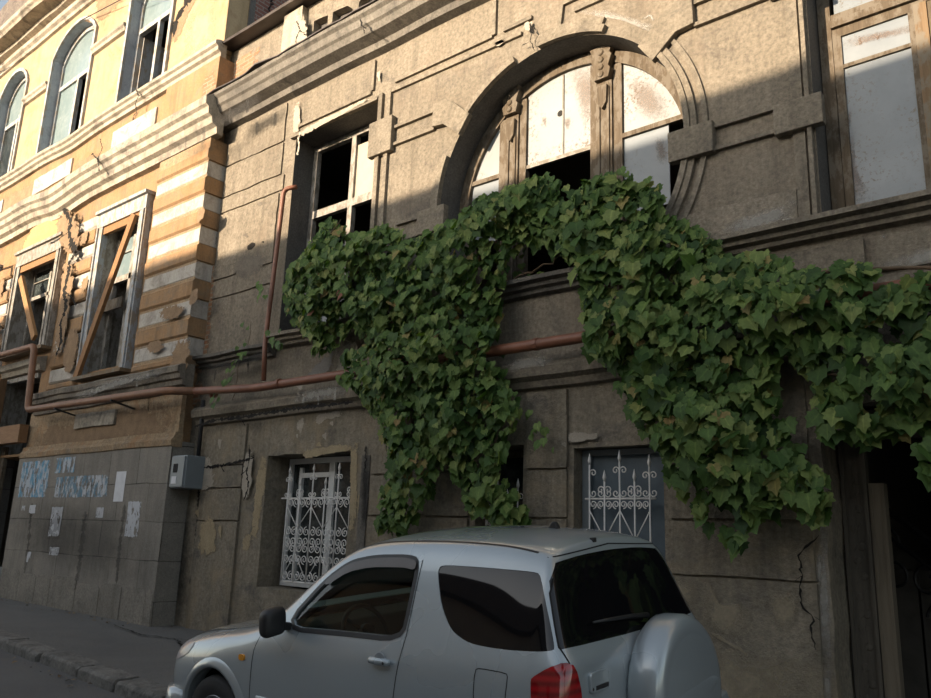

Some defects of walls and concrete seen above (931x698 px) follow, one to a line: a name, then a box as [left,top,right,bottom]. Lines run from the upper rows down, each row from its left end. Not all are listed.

crack [171,0,195,42]
peeling [293,98,370,155]
crack [50,208,80,359]
spalling [169,338,204,407]
crack [195,400,353,428]
crack [204,447,254,501]
peeling [303,410,360,536]
peeling [195,510,222,555]
crack [795,535,820,650]